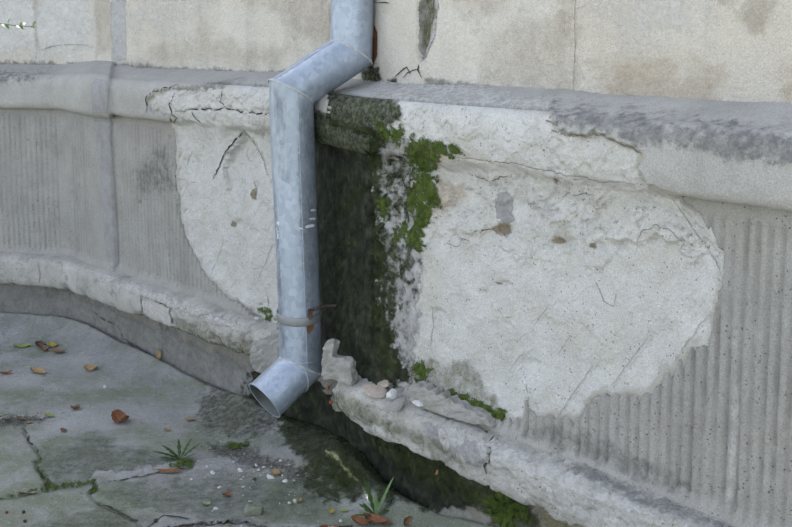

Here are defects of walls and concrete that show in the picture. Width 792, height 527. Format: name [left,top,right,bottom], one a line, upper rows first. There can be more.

flaking render [418,0,439,62]
crack [145,84,267,194]
flaking render [147,84,279,324]
flaking render [371,80,725,451]
damp [241,365,262,402]
crack [98,502,267,527]
damp [275,380,466,513]
peeling [477,437,725,527]